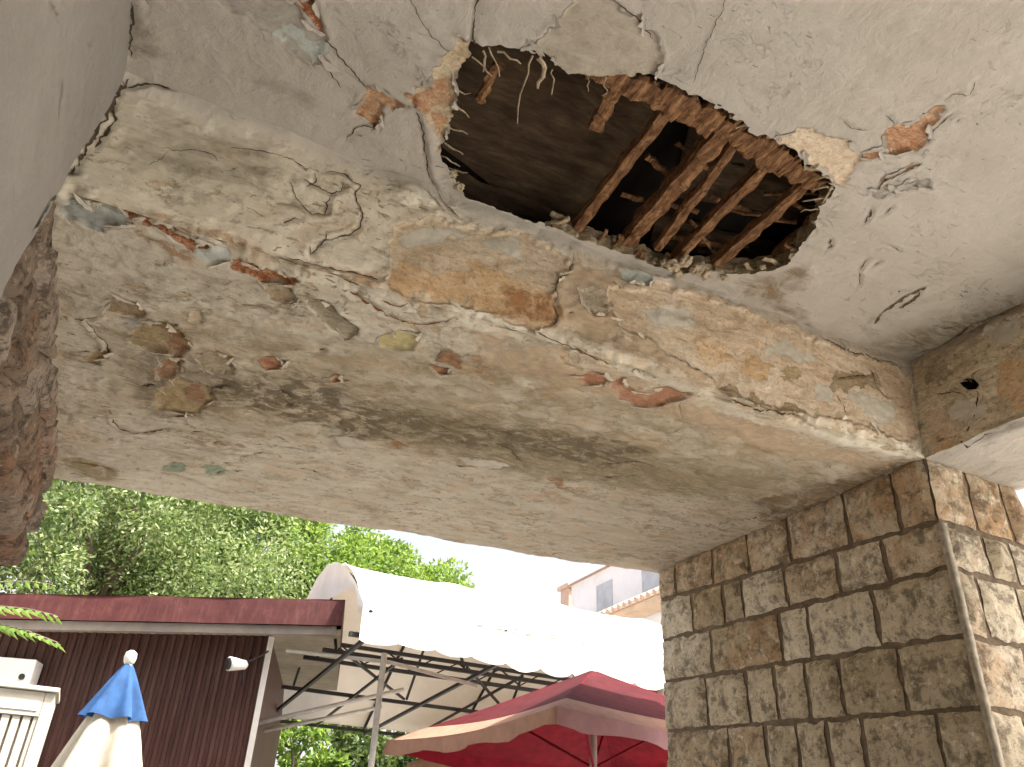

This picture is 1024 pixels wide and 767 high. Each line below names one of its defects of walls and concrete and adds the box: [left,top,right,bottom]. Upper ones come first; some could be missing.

crack [68,2,171,174]
flaking render [351,37,471,152]
flaking render [774,105,945,222]
flaking render [95,294,242,418]
peeling [59,194,359,341]
crack [149,147,453,325]
flaking render [381,215,574,336]
flaking render [569,267,1024,460]
crack [828,305,1020,366]